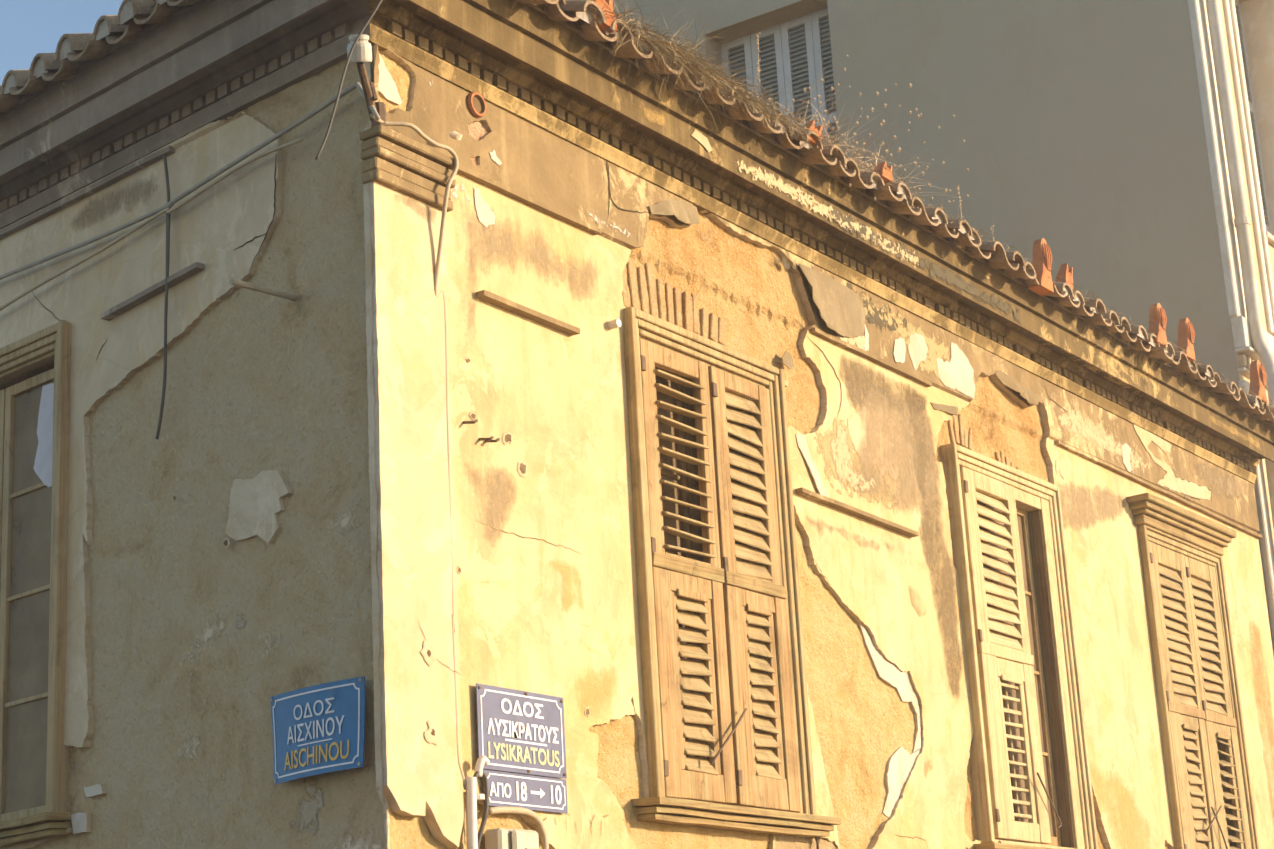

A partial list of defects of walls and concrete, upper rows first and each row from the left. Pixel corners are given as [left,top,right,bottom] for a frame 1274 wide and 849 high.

peeling [692,130,712,152]
crack [234,161,276,272]
leakage [469,219,595,296]
peeling [736,160,919,267]
flaking render [589,199,1211,513]
flaking render [26,46,555,849]
leakage [841,358,961,695]
leakage [1060,485,1124,527]
flaking render [585,505,924,849]